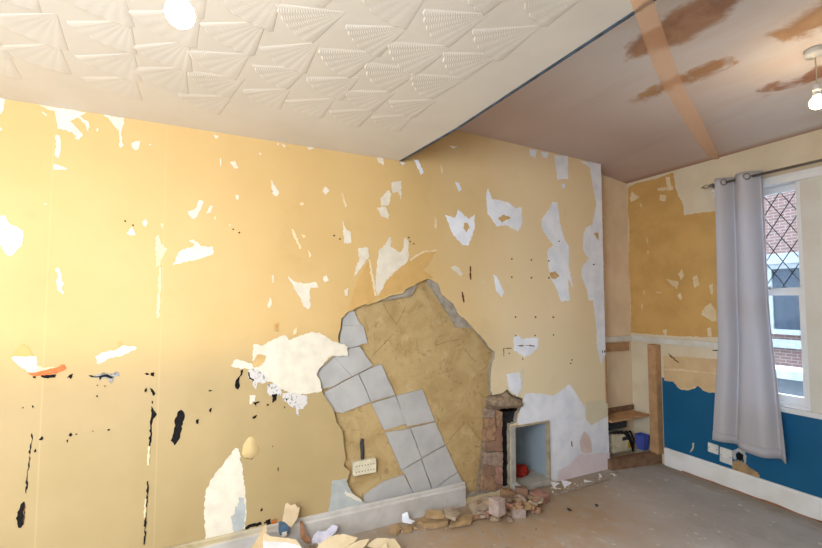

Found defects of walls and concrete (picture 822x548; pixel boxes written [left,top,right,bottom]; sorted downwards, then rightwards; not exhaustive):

damp [610,0,757,64]
damp [756,0,822,46]
damp [624,52,744,108]
damp [743,63,822,100]
peeling [529,149,568,189]
peeling [0,215,24,256]
peeling [541,161,606,364]
peeling [667,269,717,336]
flaking render [231,274,610,511]
flaking render [204,448,247,539]